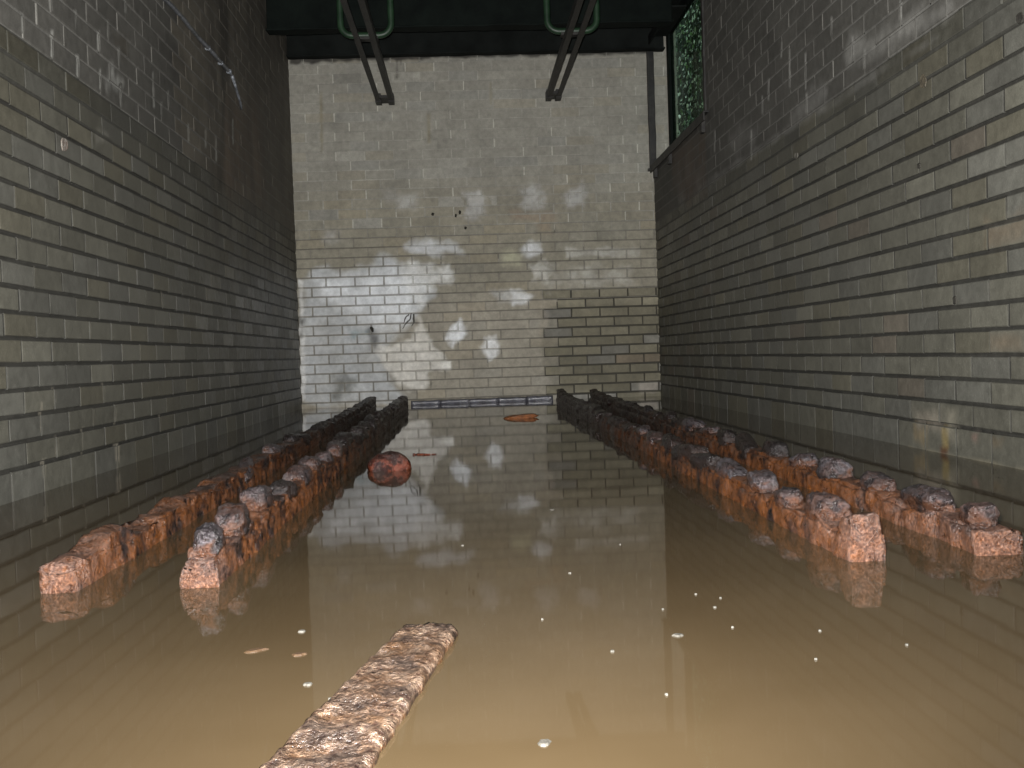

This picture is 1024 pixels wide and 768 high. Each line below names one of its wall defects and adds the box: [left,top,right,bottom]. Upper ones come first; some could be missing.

leakage [186,0,661,406]